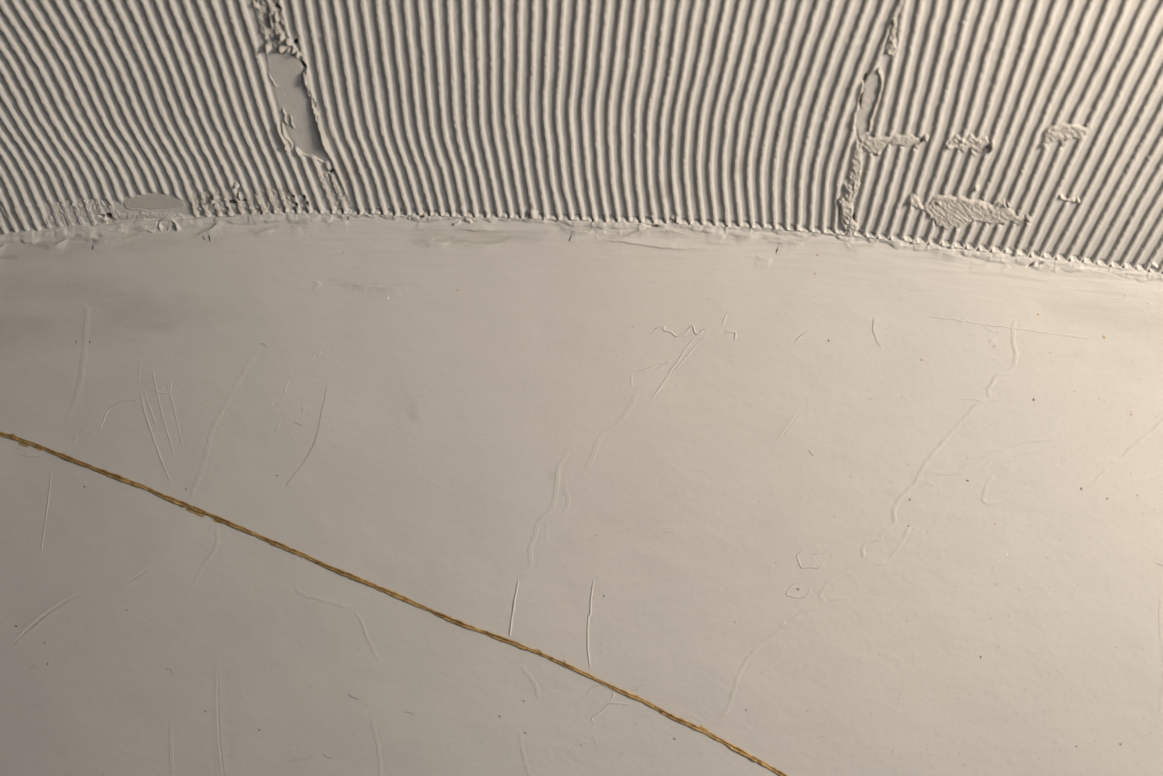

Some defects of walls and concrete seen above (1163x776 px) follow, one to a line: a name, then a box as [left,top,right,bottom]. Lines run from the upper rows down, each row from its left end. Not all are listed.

peeling [850,68,885,156]